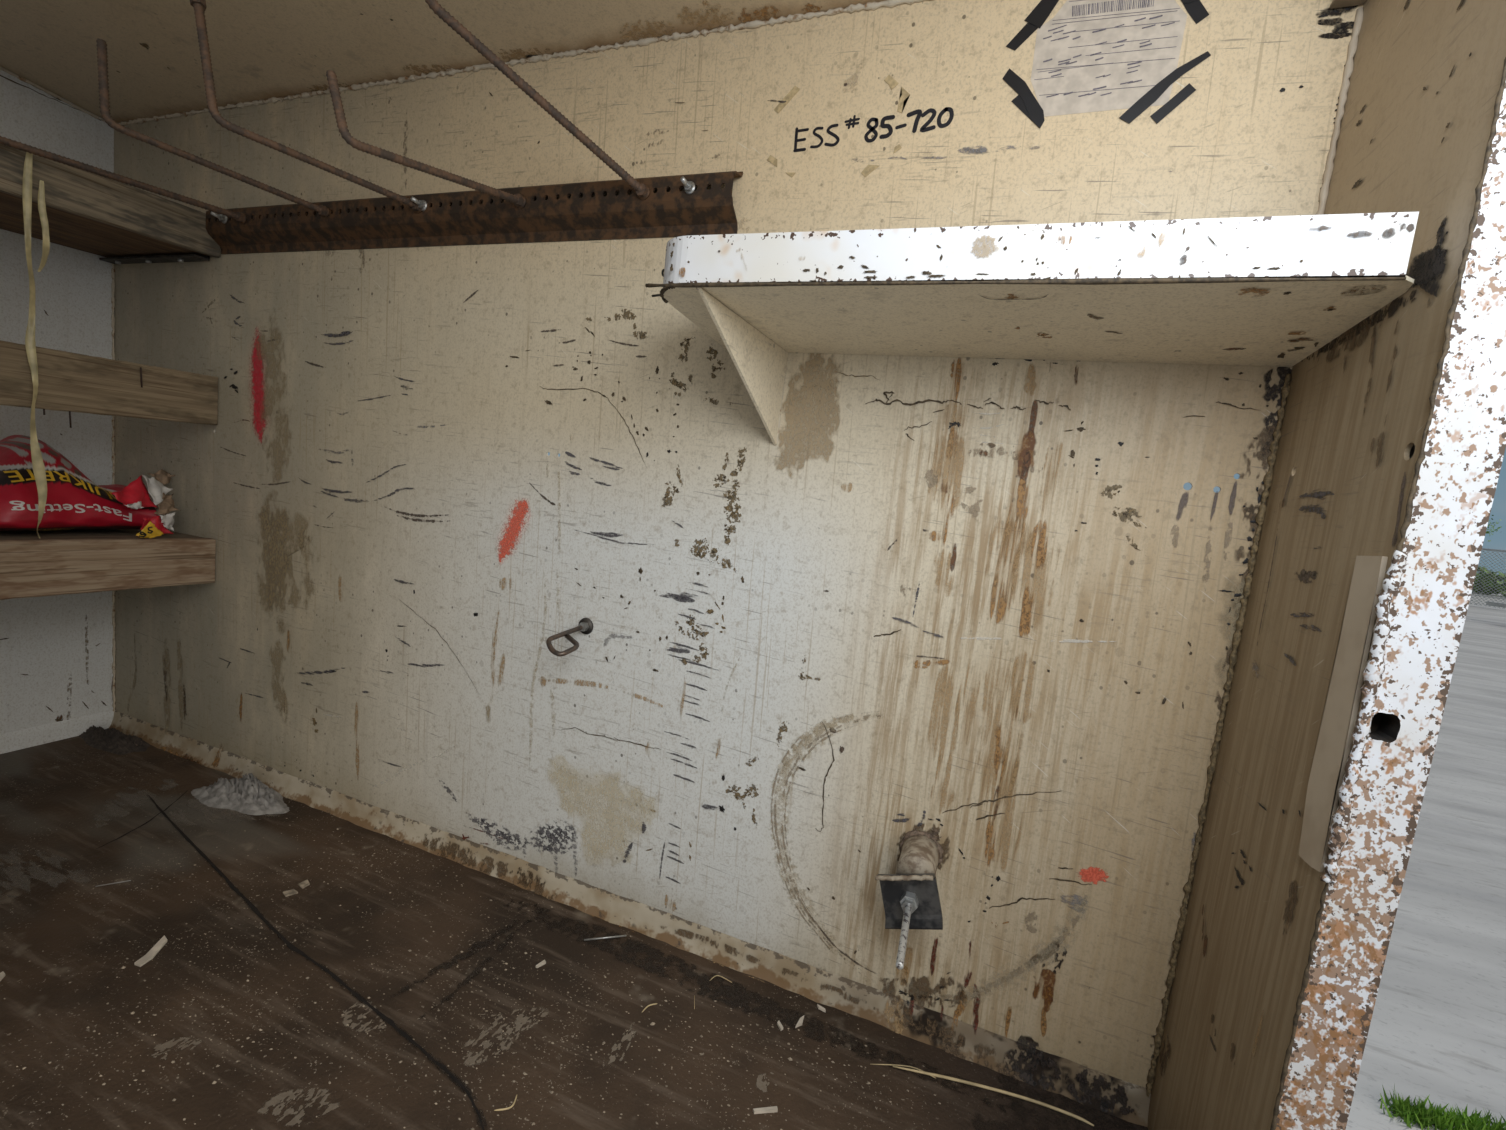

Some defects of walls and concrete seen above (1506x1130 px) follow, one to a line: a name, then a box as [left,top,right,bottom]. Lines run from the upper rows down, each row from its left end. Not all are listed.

corrosion [623,1,780,39]
corrosion [1396,57,1506,552]
corrosion [915,358,1078,869]
crack [99,790,487,1130]
damp [462,814,577,874]
damp [660,823,684,883]
damp [664,731,696,783]
damp [398,895,1147,1130]
damp [771,715,880,973]
corrosion [821,939,980,1035]
corrosion [1033,945,1067,1037]
corrosion [1270,883,1329,1130]